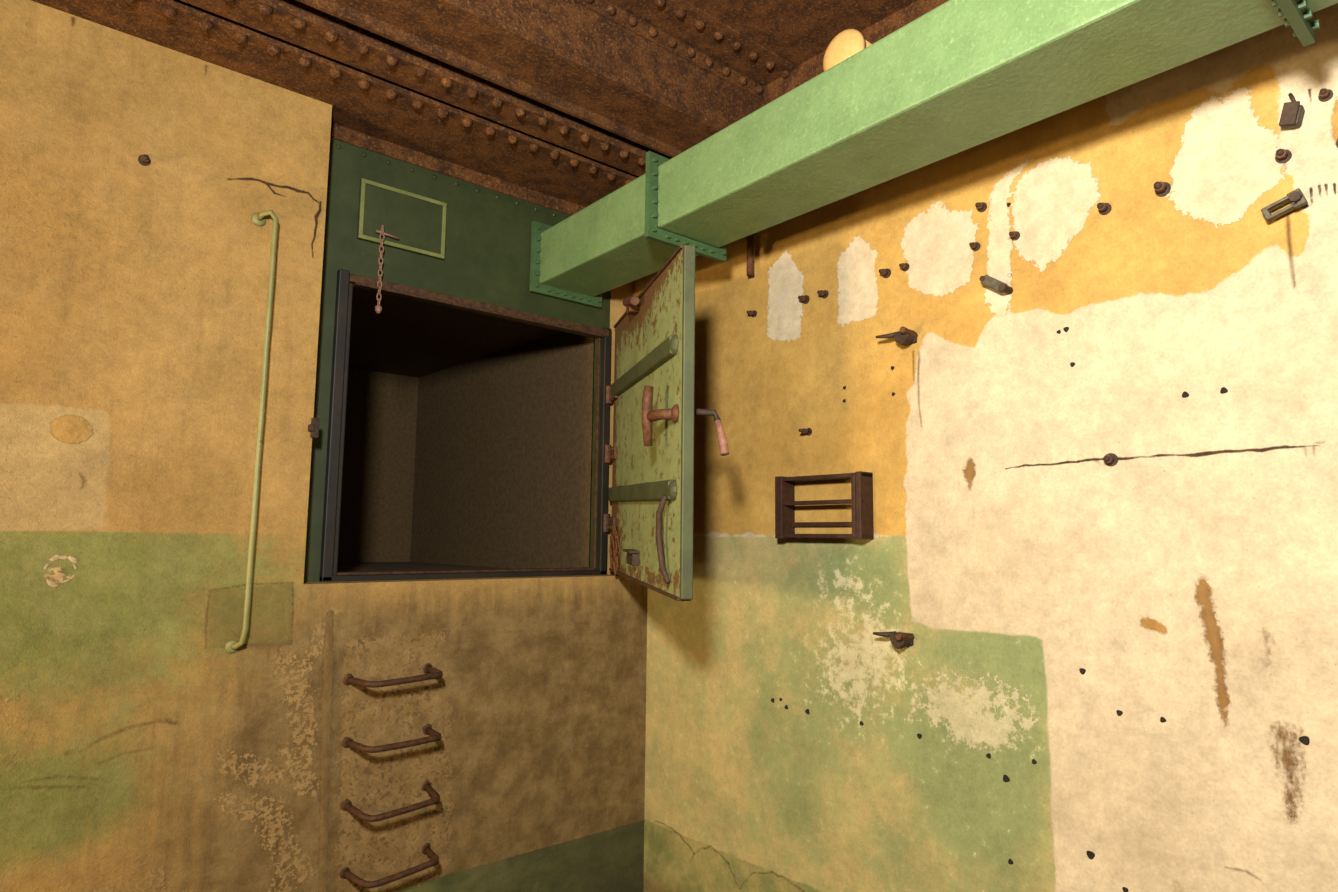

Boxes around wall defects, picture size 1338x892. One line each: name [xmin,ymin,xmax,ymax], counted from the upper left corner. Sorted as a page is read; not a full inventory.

peeling [1165,81,1286,228]
peeling [900,155,1101,317]
crack [1005,445,1317,469]
water stain [1278,728,1294,803]